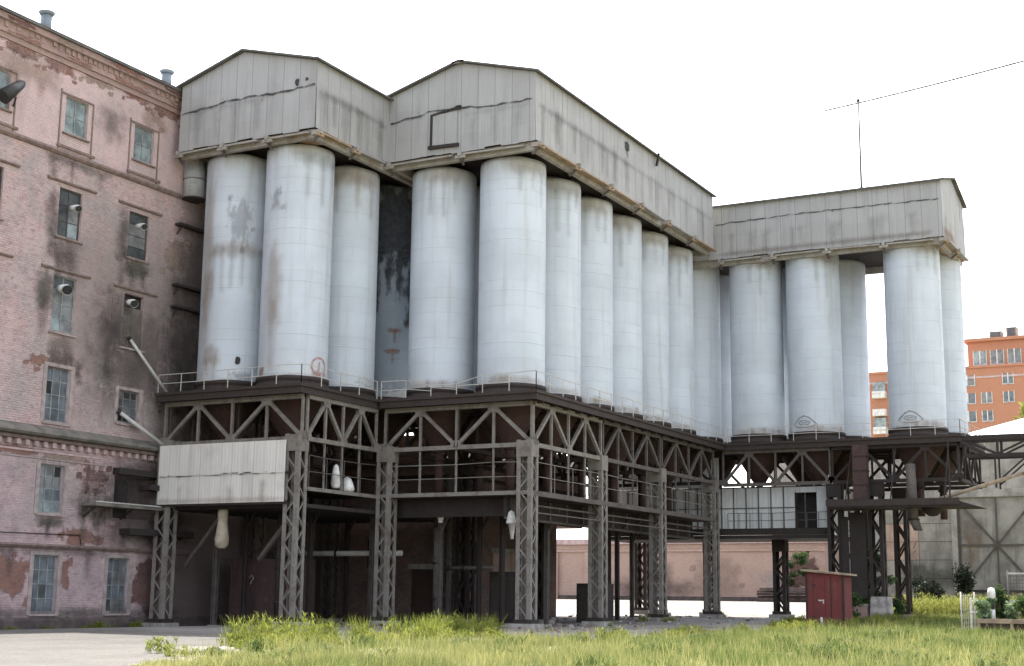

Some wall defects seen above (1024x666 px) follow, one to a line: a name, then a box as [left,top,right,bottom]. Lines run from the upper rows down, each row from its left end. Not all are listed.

spalling [23,353,49,371]
spalling [0,444,112,495]
spalling [58,528,104,546]
spalling [0,552,30,607]